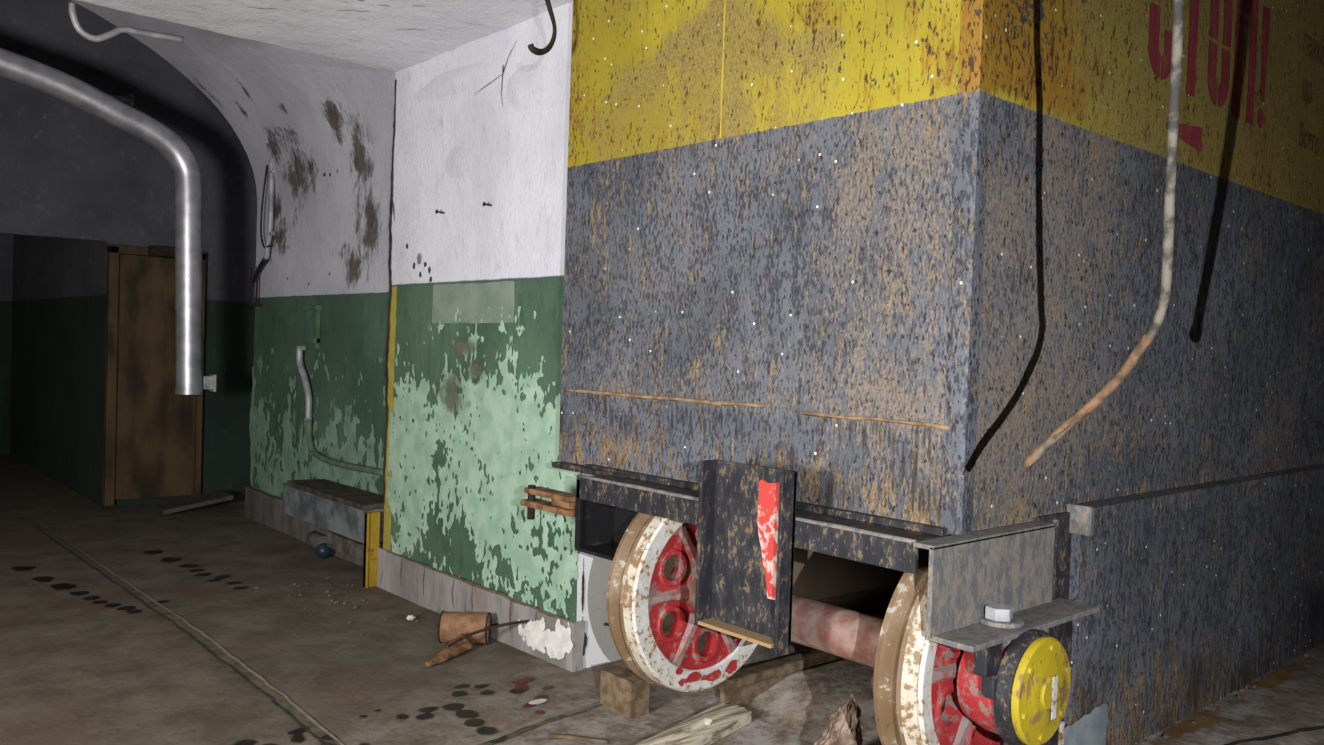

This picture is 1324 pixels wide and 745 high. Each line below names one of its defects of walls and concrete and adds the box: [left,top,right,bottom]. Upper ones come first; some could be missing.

leakage [267,129,318,258]
leakage [325,99,379,284]
peeling [249,306,581,660]
corrosion [1152,702,1237,745]